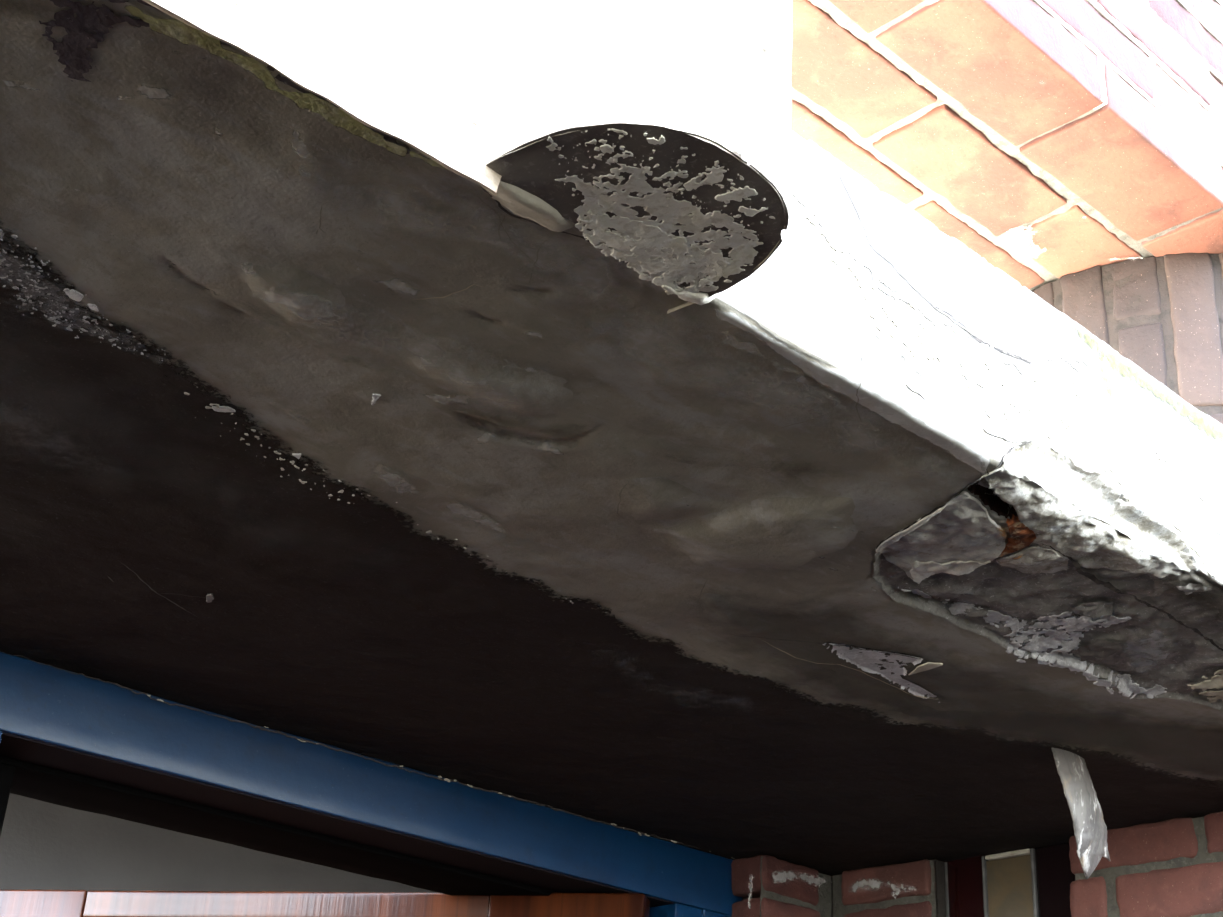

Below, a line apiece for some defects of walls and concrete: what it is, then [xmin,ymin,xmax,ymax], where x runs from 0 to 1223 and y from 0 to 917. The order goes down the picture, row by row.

crack [472,185,648,287]
peeling [546,128,788,295]
damp [0,227,168,363]
peeling [791,138,1223,711]
rust [967,484,1036,560]
crack [875,438,1198,553]
damp [898,587,1168,699]
crack [1030,542,1223,651]